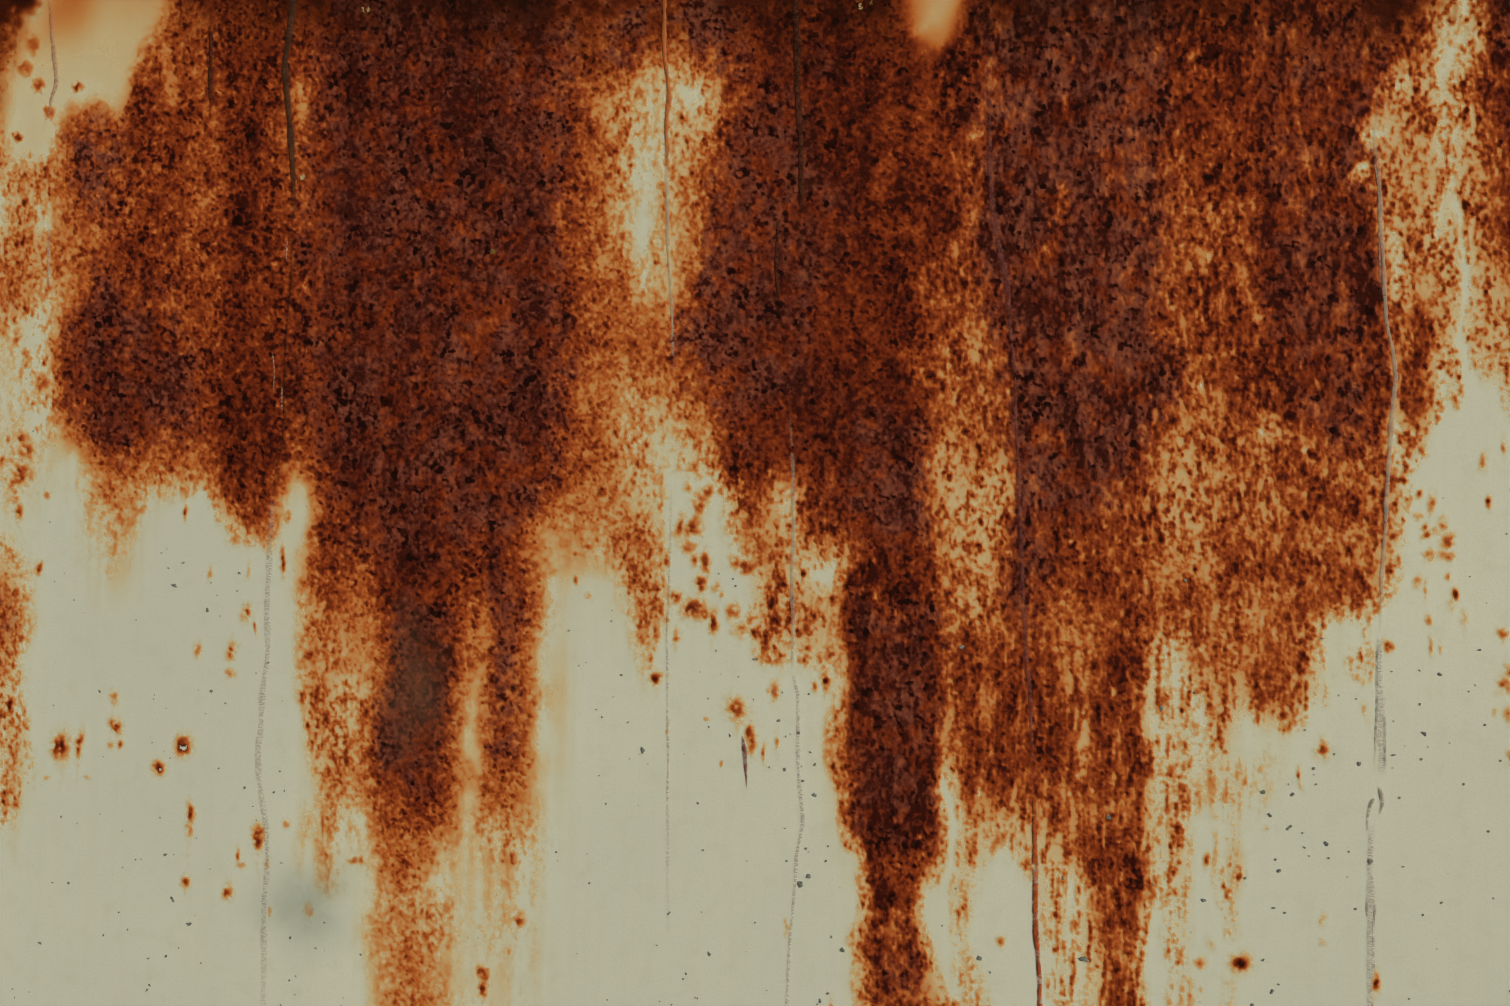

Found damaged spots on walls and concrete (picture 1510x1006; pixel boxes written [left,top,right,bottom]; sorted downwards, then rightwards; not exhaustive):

corrosion [0,0,738,1006]
corrosion [673,0,1510,1006]